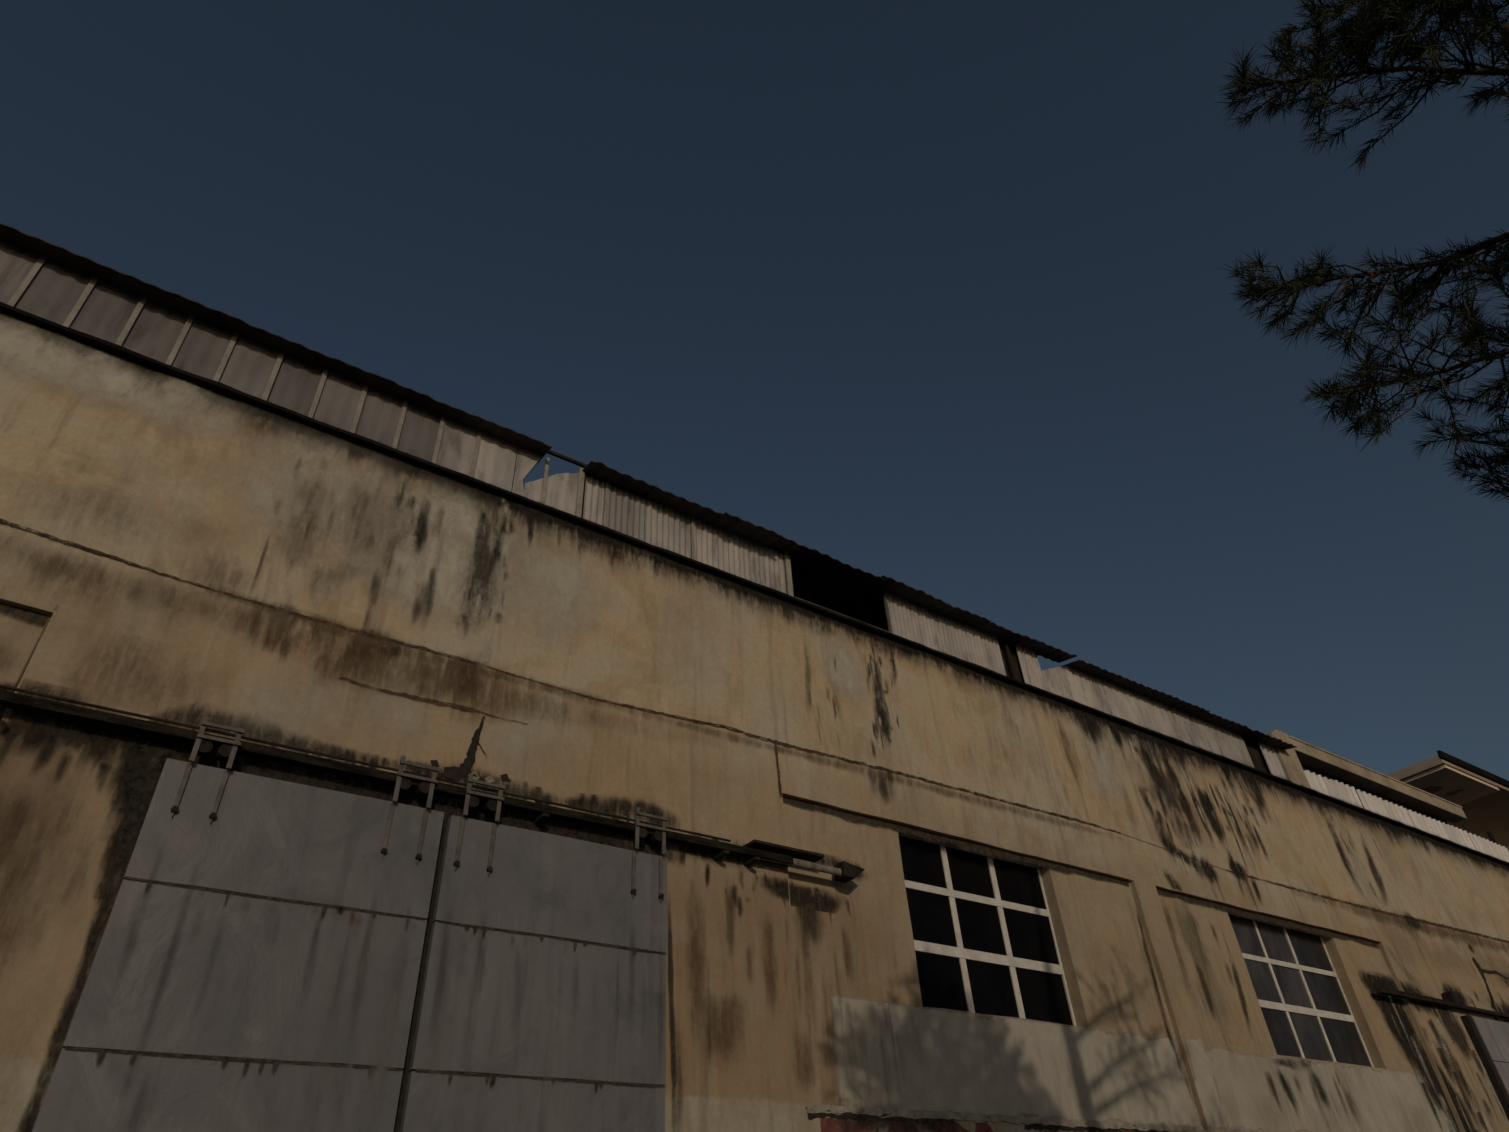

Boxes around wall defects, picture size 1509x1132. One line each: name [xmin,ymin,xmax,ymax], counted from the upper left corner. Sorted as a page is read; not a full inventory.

water stain [0,313,1509,1010]
water stain [0,603,742,1132]
water stain [841,1112,949,1132]
water stain [783,796,1190,1091]
water stain [1233,966,1249,1022]
water stain [1271,1059,1340,1106]
water stain [1361,973,1504,1132]